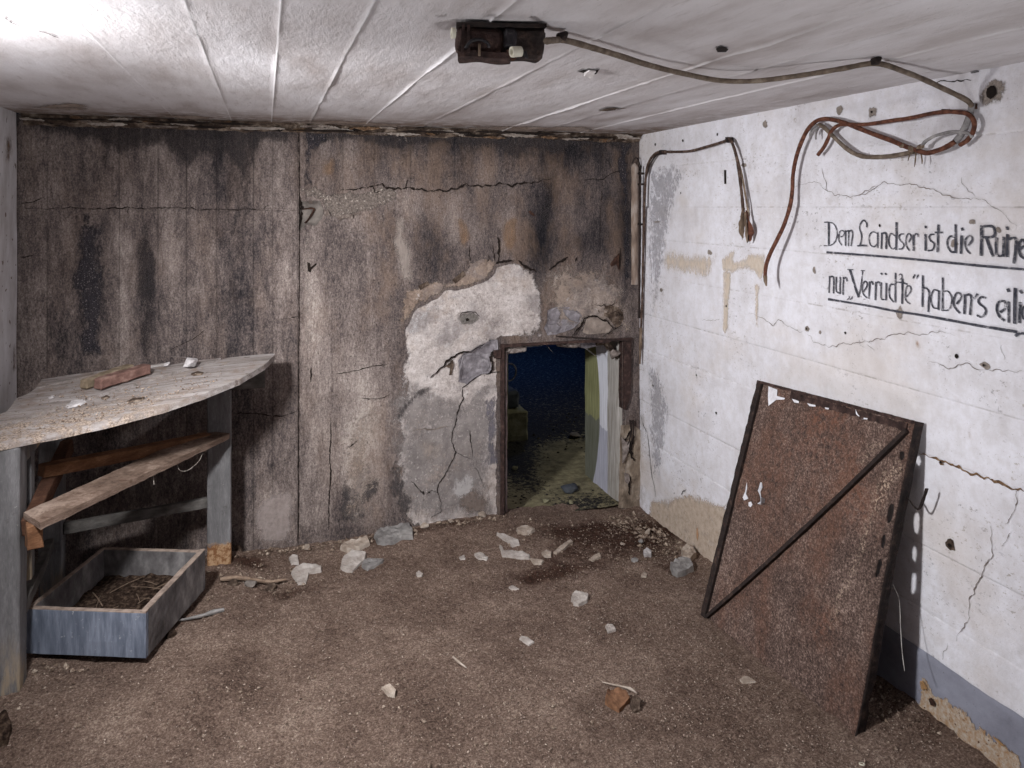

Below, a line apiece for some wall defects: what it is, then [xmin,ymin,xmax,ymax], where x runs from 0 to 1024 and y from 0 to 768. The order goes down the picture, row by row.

crack [341,179,549,193]
crack [802,172,1017,226]
leakage [667,252,764,333]
peeling [389,249,630,525]
crack [411,371,500,517]
leakage [650,495,725,563]
crack [919,453,1023,652]
peeling [919,678,1021,768]